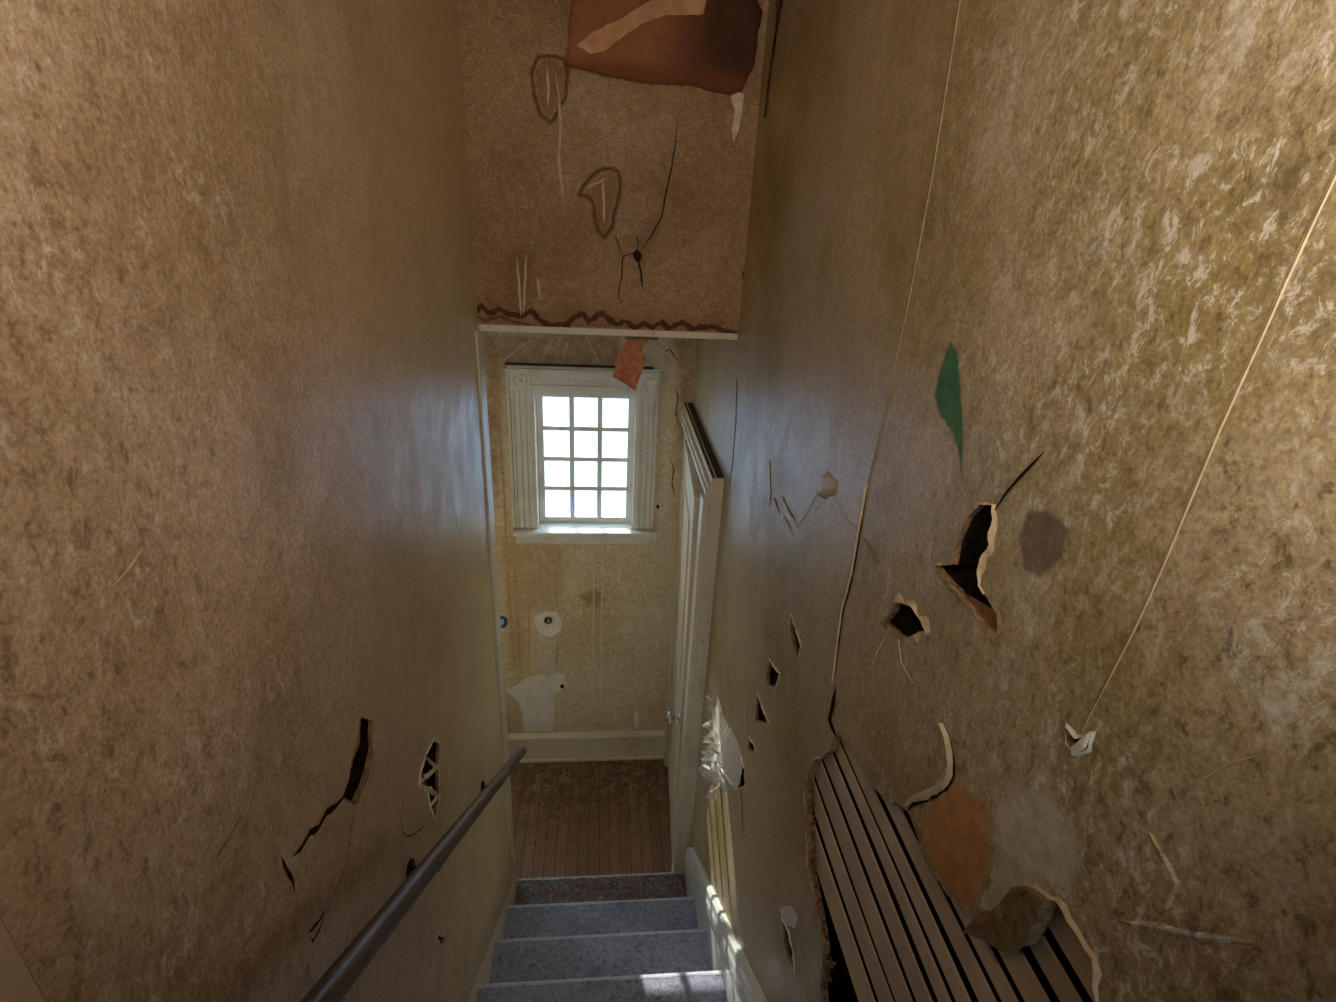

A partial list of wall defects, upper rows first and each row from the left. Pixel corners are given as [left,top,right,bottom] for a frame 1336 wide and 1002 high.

crack [615,117,678,304]
spalling [933,452,1044,635]
flaking render [534,611,561,637]
spalling [788,612,802,661]
spalling [870,593,931,683]
spalling [281,717,374,943]
spalling [401,726,441,837]
flaking render [505,672,567,731]
peeling [698,659,781,832]
spalling [803,687,1102,1002]
spalling [780,905,797,973]